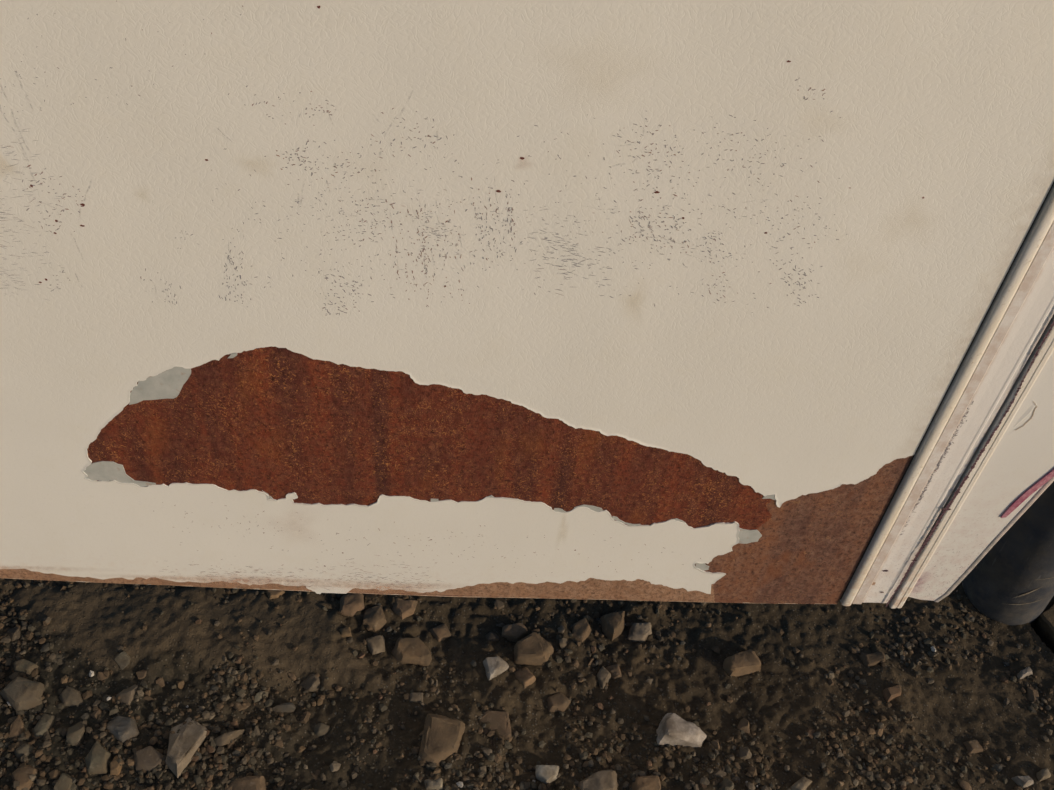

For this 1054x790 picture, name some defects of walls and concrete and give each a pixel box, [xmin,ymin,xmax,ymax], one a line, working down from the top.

corrosion [0,569,309,590]
peeling [80,345,915,584]
corrosion [84,346,912,604]